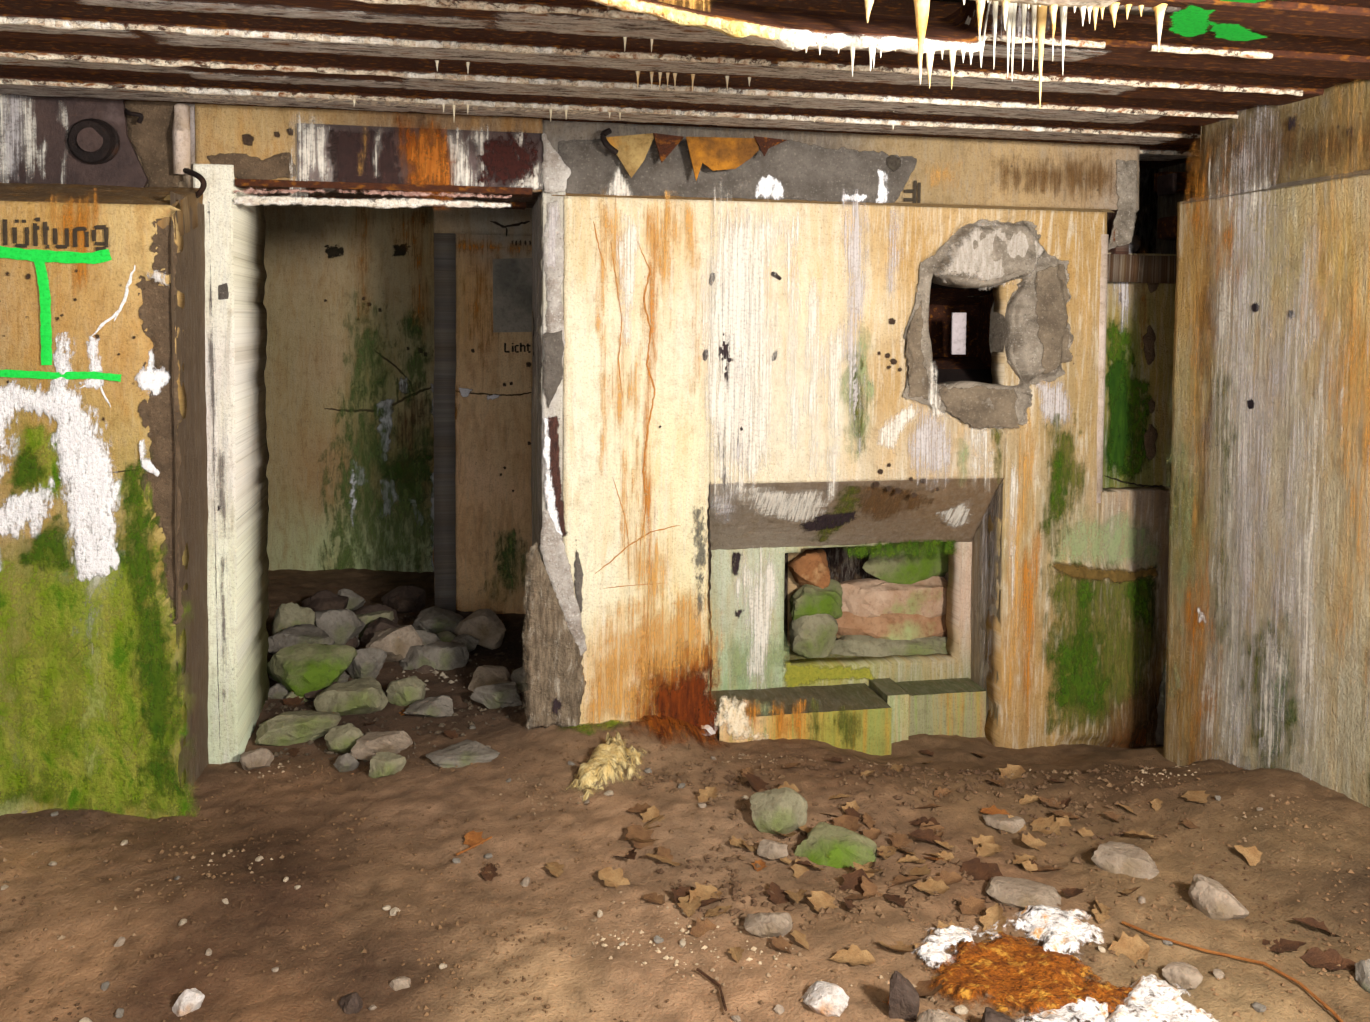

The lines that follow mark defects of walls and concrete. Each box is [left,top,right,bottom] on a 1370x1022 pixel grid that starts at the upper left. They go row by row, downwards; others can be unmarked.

rust [327,115,457,323]
rust [476,130,539,188]
rust [596,192,694,424]
rust [587,447,722,746]
leakage [0,0,1370,770]
spalling [522,133,917,729]
spalling [873,463,939,498]
spalling [878,208,1074,429]
rust [1186,573,1215,761]
rust [1187,169,1244,454]